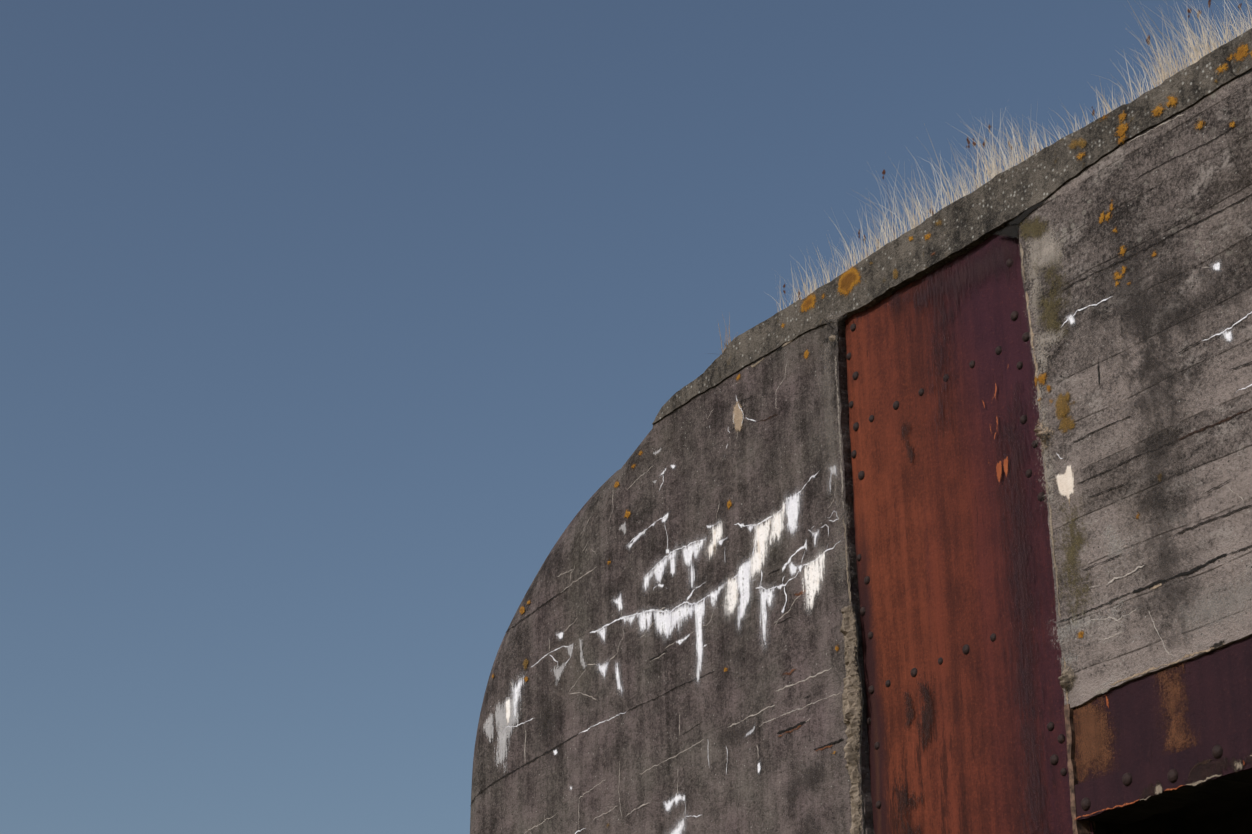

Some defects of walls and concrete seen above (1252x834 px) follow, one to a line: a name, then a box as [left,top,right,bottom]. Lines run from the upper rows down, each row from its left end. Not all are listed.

corrosion [996,457,1008,482]
water stain [483,475,840,773]
corrosion [904,682,936,753]
corrosion [1073,696,1114,781]
corrosion [1156,664,1195,752]
corrosion [1074,756,1245,820]